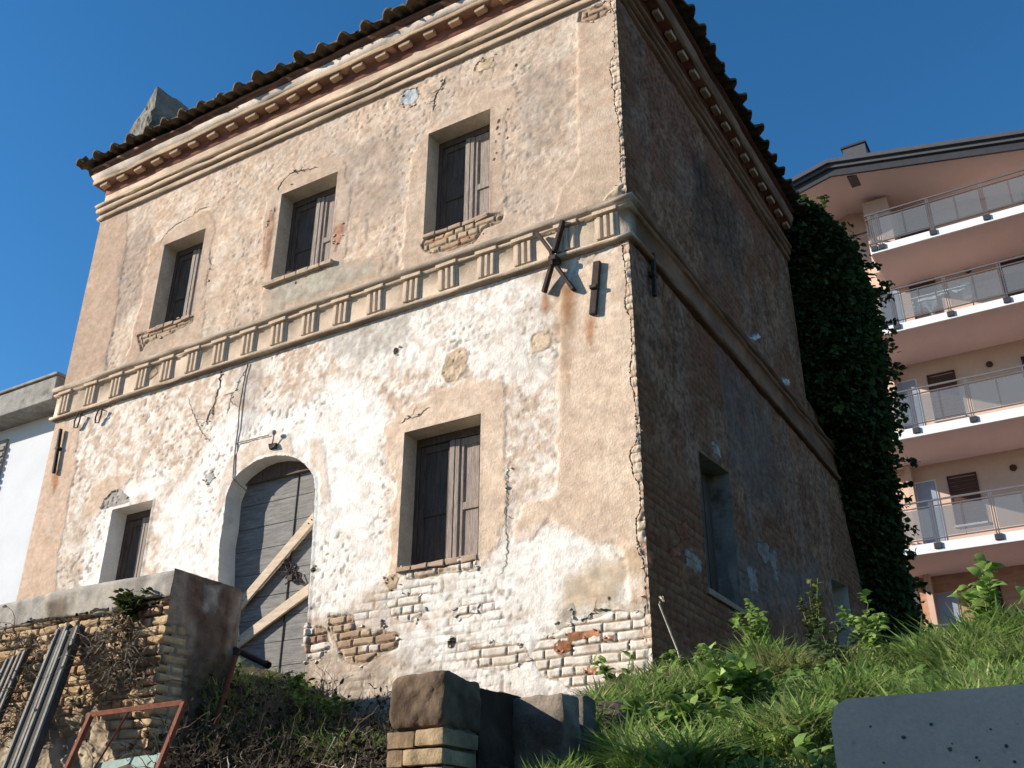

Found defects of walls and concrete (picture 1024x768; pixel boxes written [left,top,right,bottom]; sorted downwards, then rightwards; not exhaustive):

flaking render [400,87,419,108]
crack [278,165,317,188]
spalling [420,212,503,253]
crack [188,364,249,440]
flaking render [99,489,129,509]
crack [499,462,513,575]
spalling [468,243,652,693]
spalling [301,558,480,667]